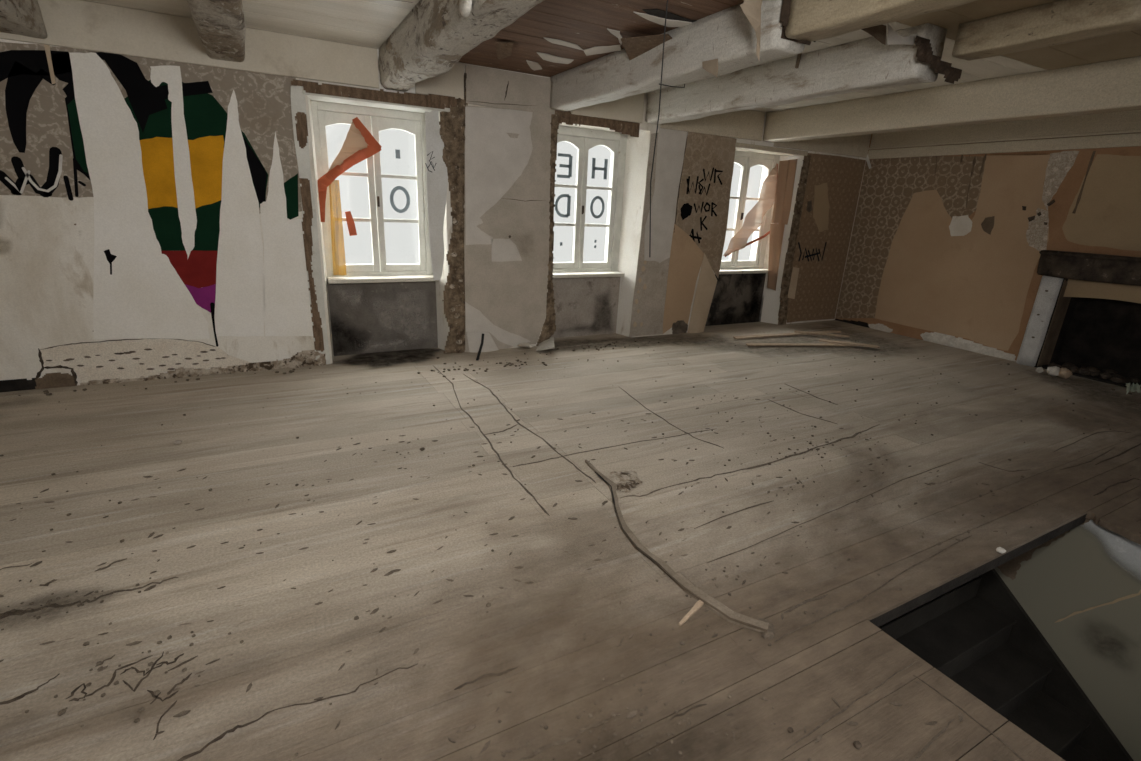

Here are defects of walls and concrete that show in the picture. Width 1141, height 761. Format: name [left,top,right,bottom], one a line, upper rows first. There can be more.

peeling [526,11,692,71]
peeling [295,112,308,149]
peeling [425,91,559,354]
peeling [644,124,687,263]
peeling [0,178,326,392]
peeling [672,253,717,334]
crack [435,367,880,516]
crack [694,501,772,529]
crack [708,458,1023,563]
crack [0,558,178,619]
crack [0,651,198,740]
crack [177,664,417,761]